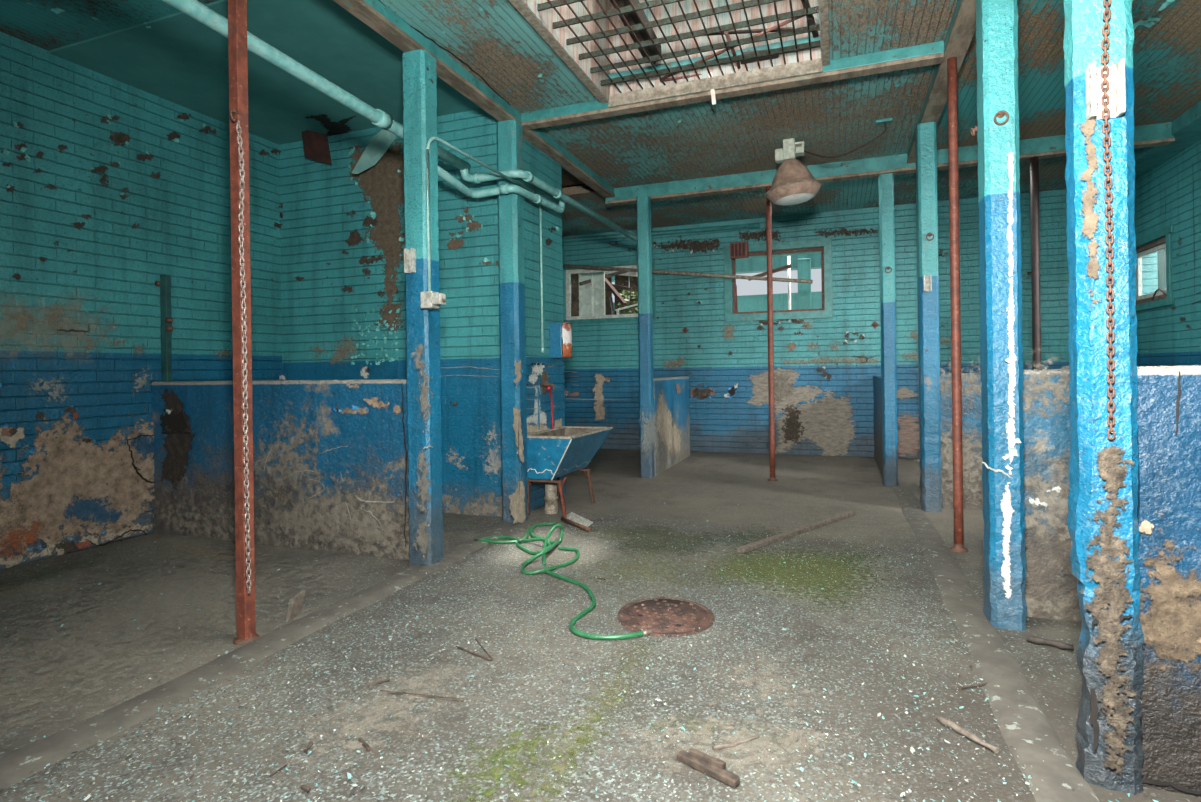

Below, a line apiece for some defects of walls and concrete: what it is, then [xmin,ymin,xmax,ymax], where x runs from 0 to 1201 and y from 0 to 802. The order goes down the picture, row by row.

peeling [1,121,68,190]
peeling [91,161,129,200]
peeling [99,114,161,179]
peeling [0,424,36,454]
peeling [28,377,79,420]
spalling [130,366,195,489]
spalling [479,358,548,483]
flaking render [592,373,611,421]
peeling [676,374,766,406]
flaking render [896,387,920,459]
spalling [1001,152,1021,603]
spalling [0,447,1042,802]